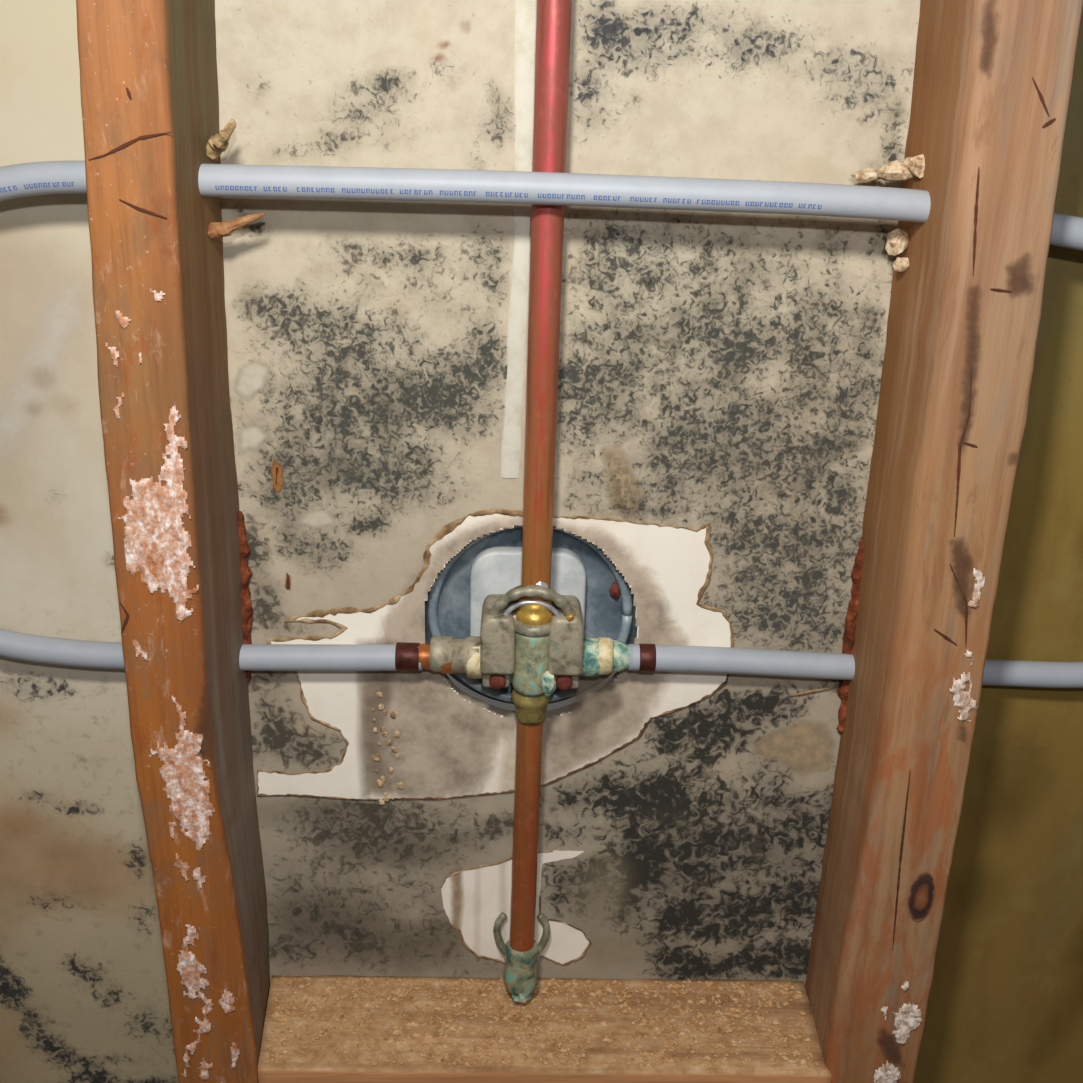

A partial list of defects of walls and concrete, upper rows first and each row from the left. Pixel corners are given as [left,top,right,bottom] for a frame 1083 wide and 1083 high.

leakage [569,1,800,127]
crack [89,132,172,160]
crack [119,199,167,219]
leakage [238,287,508,569]
leakage [555,213,884,652]
peeling [266,509,523,644]
peeling [553,450,734,648]
peeling [257,671,517,801]
leakage [295,669,517,874]
peeling [541,672,729,787]
leakage [540,669,834,980]
peeling [441,857,512,963]